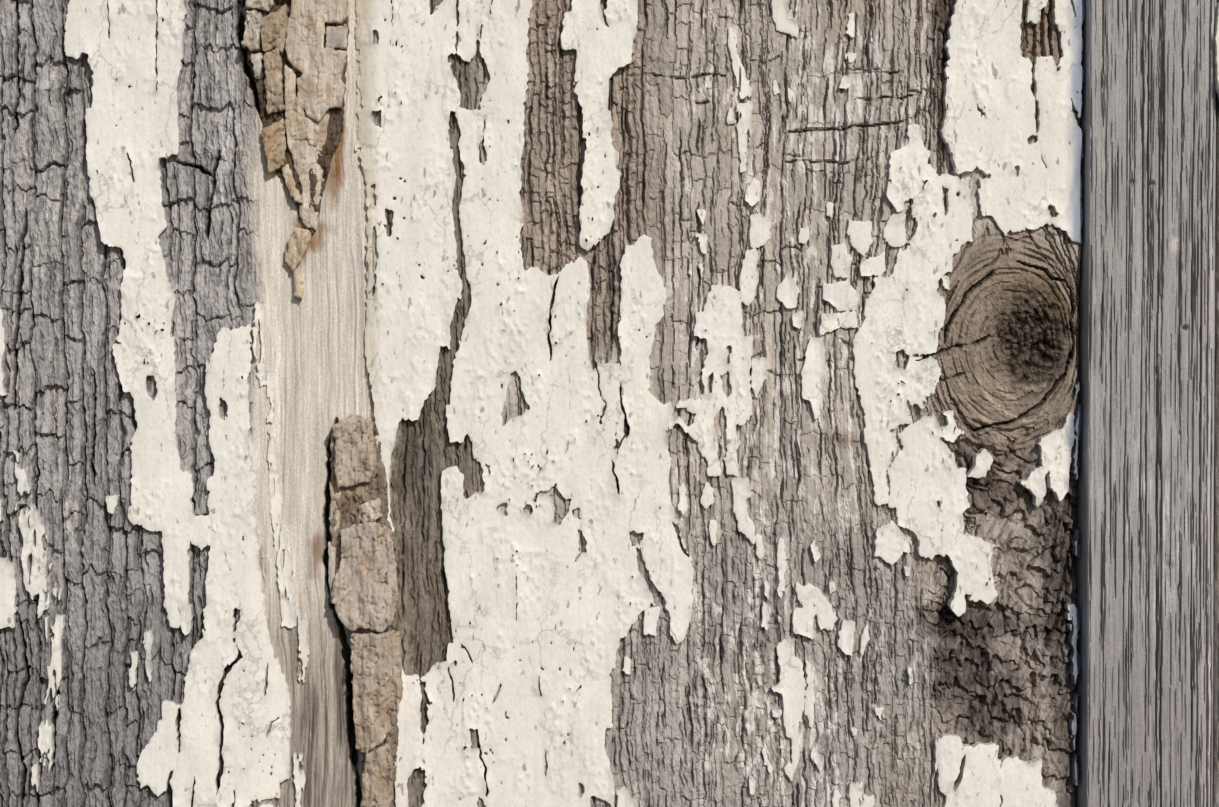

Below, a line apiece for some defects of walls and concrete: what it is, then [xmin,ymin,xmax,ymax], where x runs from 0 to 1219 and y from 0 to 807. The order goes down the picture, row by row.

peeling [0,308,8,396]
peeling [64,0,310,807]
peeling [241,0,875,807]
peeling [776,0,1085,617]
crack [937,273,991,374]
crack [970,266,1074,431]
peeling [0,450,66,792]
peeling [933,733,1058,807]
peeling [1064,603,1081,786]